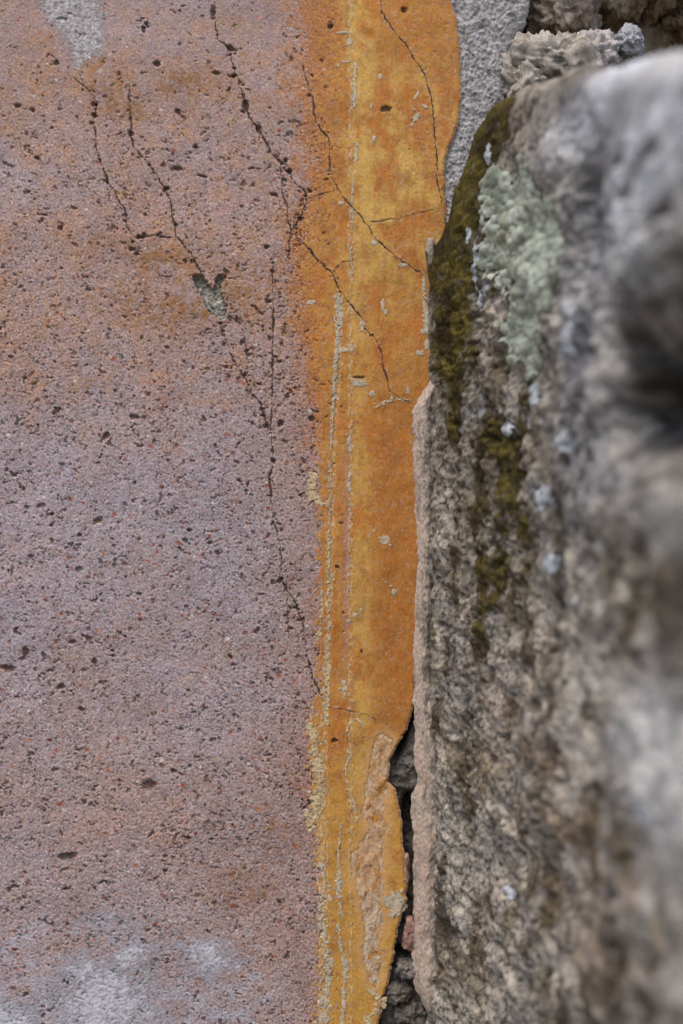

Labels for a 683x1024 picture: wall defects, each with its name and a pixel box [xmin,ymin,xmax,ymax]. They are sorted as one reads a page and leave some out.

peeling [39,0,105,69]
crack [79,74,201,277]
spalling [443,0,531,225]
spalling [194,275,227,320]
crack [214,0,442,719]
peeling [313,705,428,1024]